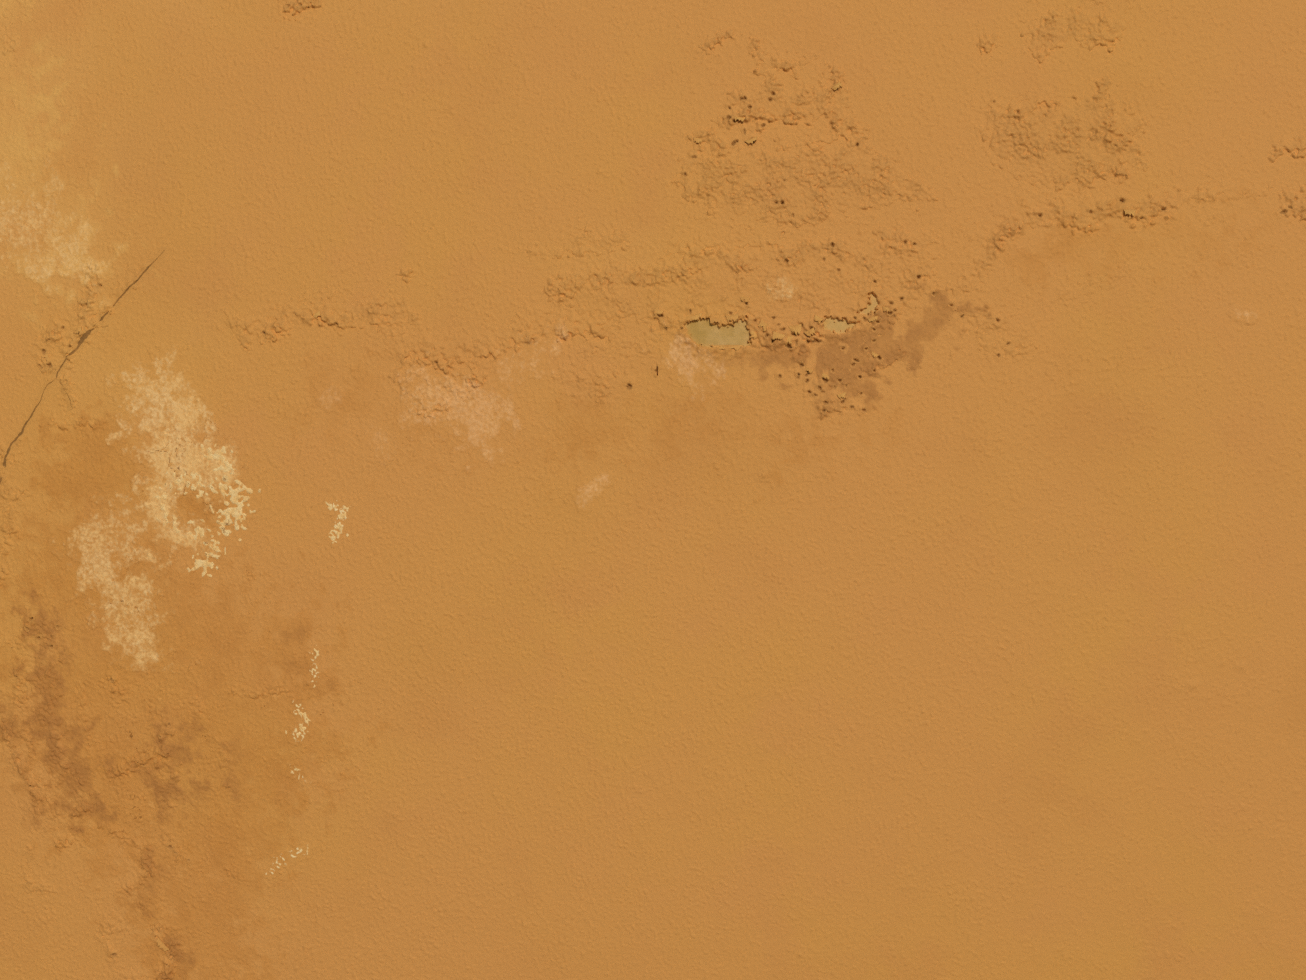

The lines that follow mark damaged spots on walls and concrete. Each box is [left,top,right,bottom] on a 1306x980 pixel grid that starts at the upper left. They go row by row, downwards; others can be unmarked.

crack [0,246,169,488]
peeling [541,219,949,351]
leakage [232,164,1292,548]
leakage [0,341,399,980]